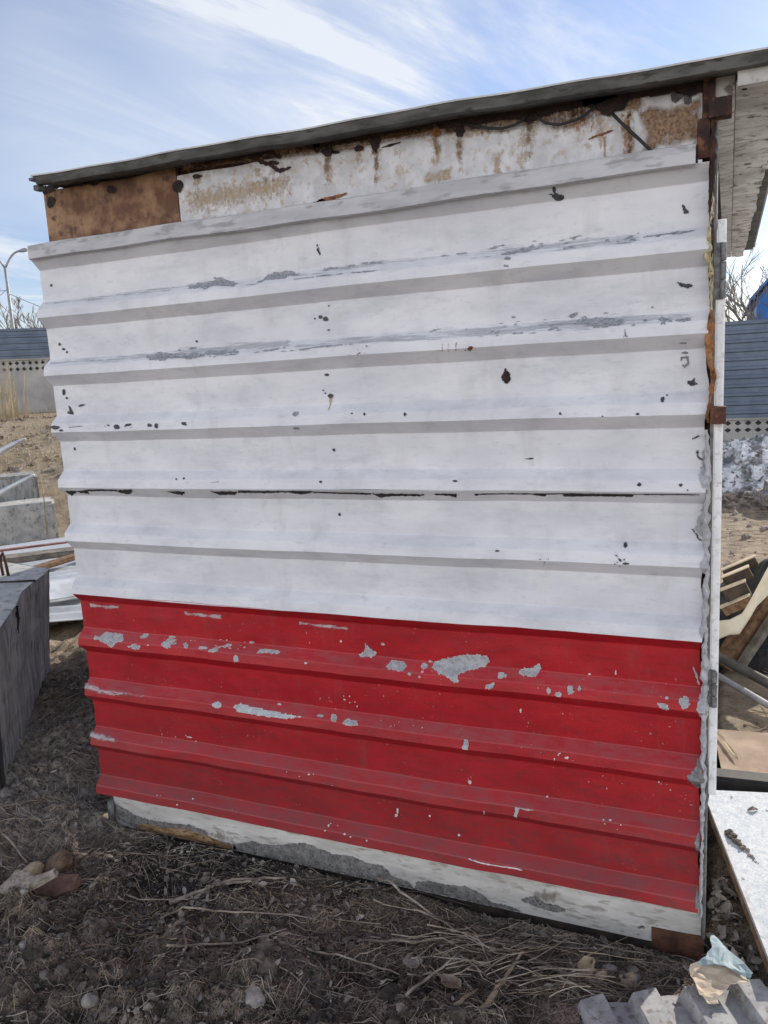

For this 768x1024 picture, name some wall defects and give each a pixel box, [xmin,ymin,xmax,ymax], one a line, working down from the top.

rust [182,80,703,212]
rust [42,179,102,195]
peeling [487,230,694,267]
peeling [121,261,394,295]
peeling [460,306,691,337]
peeling [50,329,439,364]
peeling [94,631,280,662]
peeling [359,643,385,658]
peeling [386,654,490,683]
peeling [212,701,302,719]